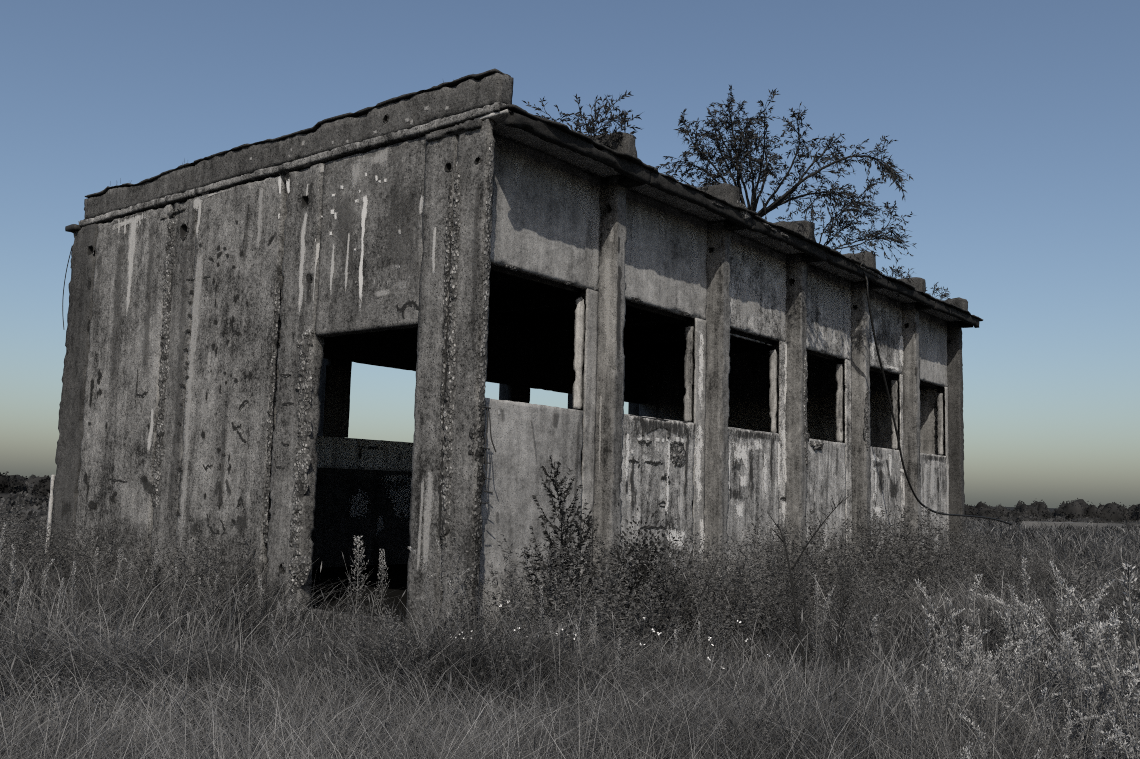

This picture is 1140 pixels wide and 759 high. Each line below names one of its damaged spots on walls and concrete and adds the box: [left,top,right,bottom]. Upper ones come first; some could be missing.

water stain [352,150,388,185]
water stain [298,183,368,313]
water stain [181,256,203,536]
water stain [215,479,230,509]
water stain [624,416,698,514]